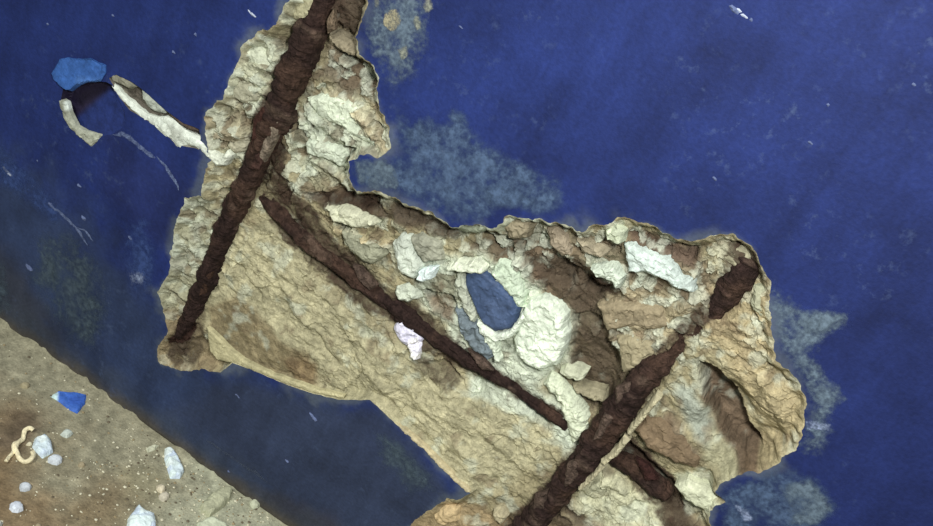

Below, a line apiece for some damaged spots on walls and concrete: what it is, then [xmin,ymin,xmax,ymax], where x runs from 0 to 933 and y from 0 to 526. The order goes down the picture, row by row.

peeling [51,57,125,147]
corrosion [168,0,569,431]
spalling [157,0,843,526]
corrosion [506,241,761,526]